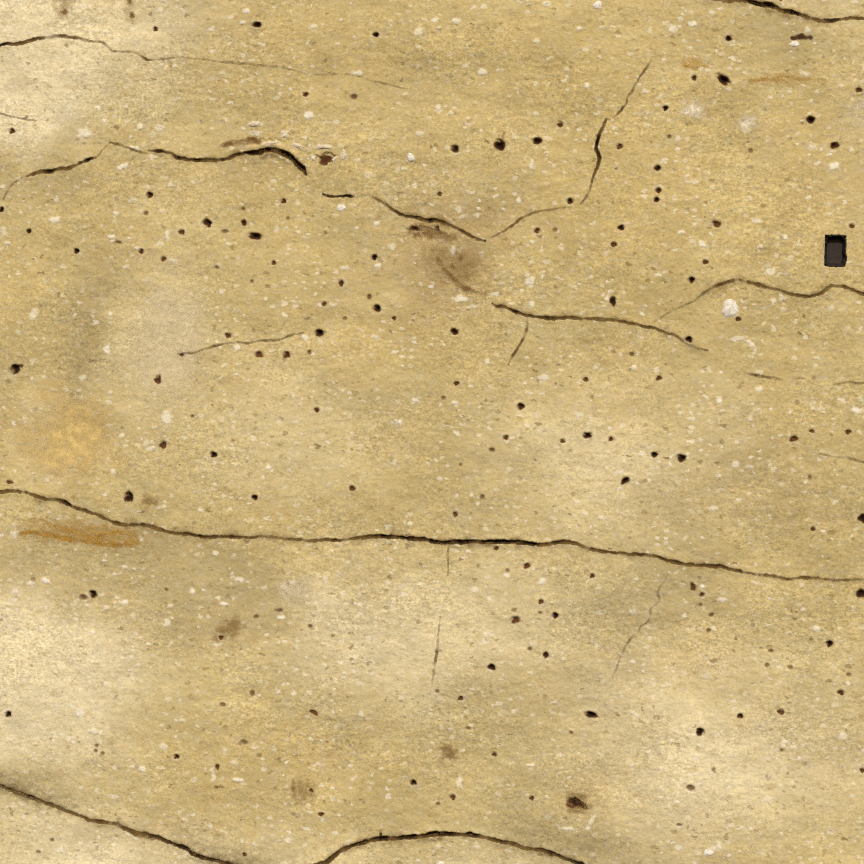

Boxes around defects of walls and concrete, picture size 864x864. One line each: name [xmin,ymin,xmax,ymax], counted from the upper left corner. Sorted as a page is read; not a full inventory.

crack [718,0,864,23]
crack [0,34,116,52]
crack [582,69,646,202]
crack [27,142,307,177]
crack [376,198,550,242]
crack [703,279,864,298]
crack [491,303,680,356]
corrosion [20,525,138,547]
crack [0,489,265,539]
crack [286,534,850,581]
crack [0,784,231,864]
crack [314,831,584,864]